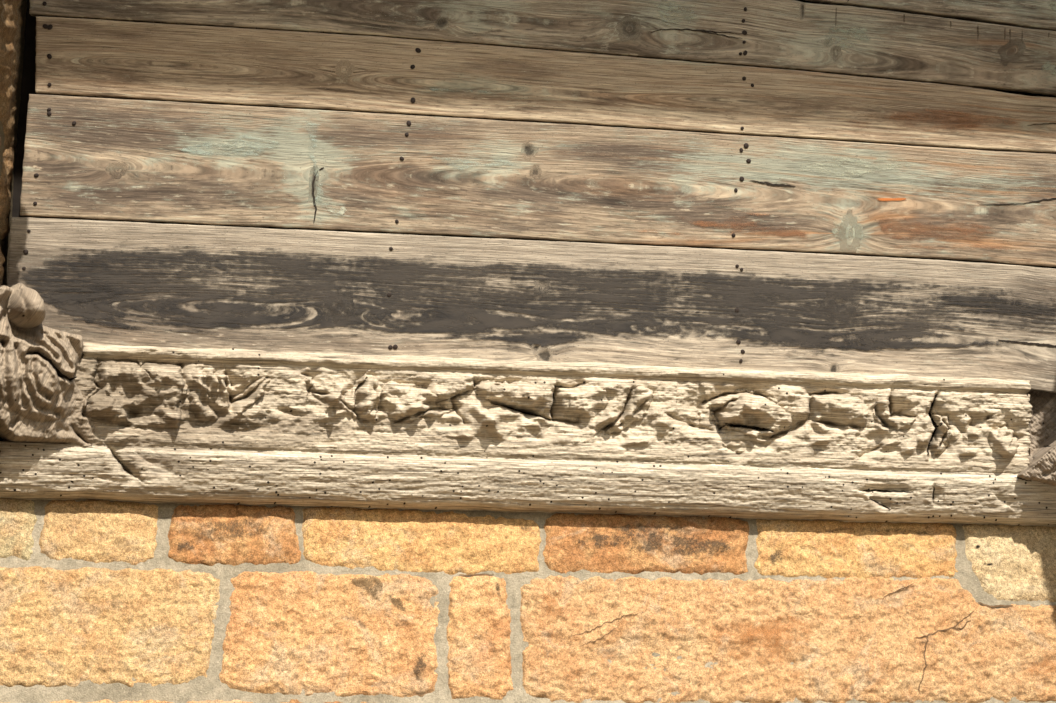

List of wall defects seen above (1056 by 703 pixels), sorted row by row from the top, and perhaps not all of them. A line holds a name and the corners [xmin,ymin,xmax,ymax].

crack [312,167,324,221]
crack [983,197,1056,205]
damp [20,242,1056,352]
crack [927,395,943,455]
crack [459,571,494,579]
crack [915,602,1013,693]